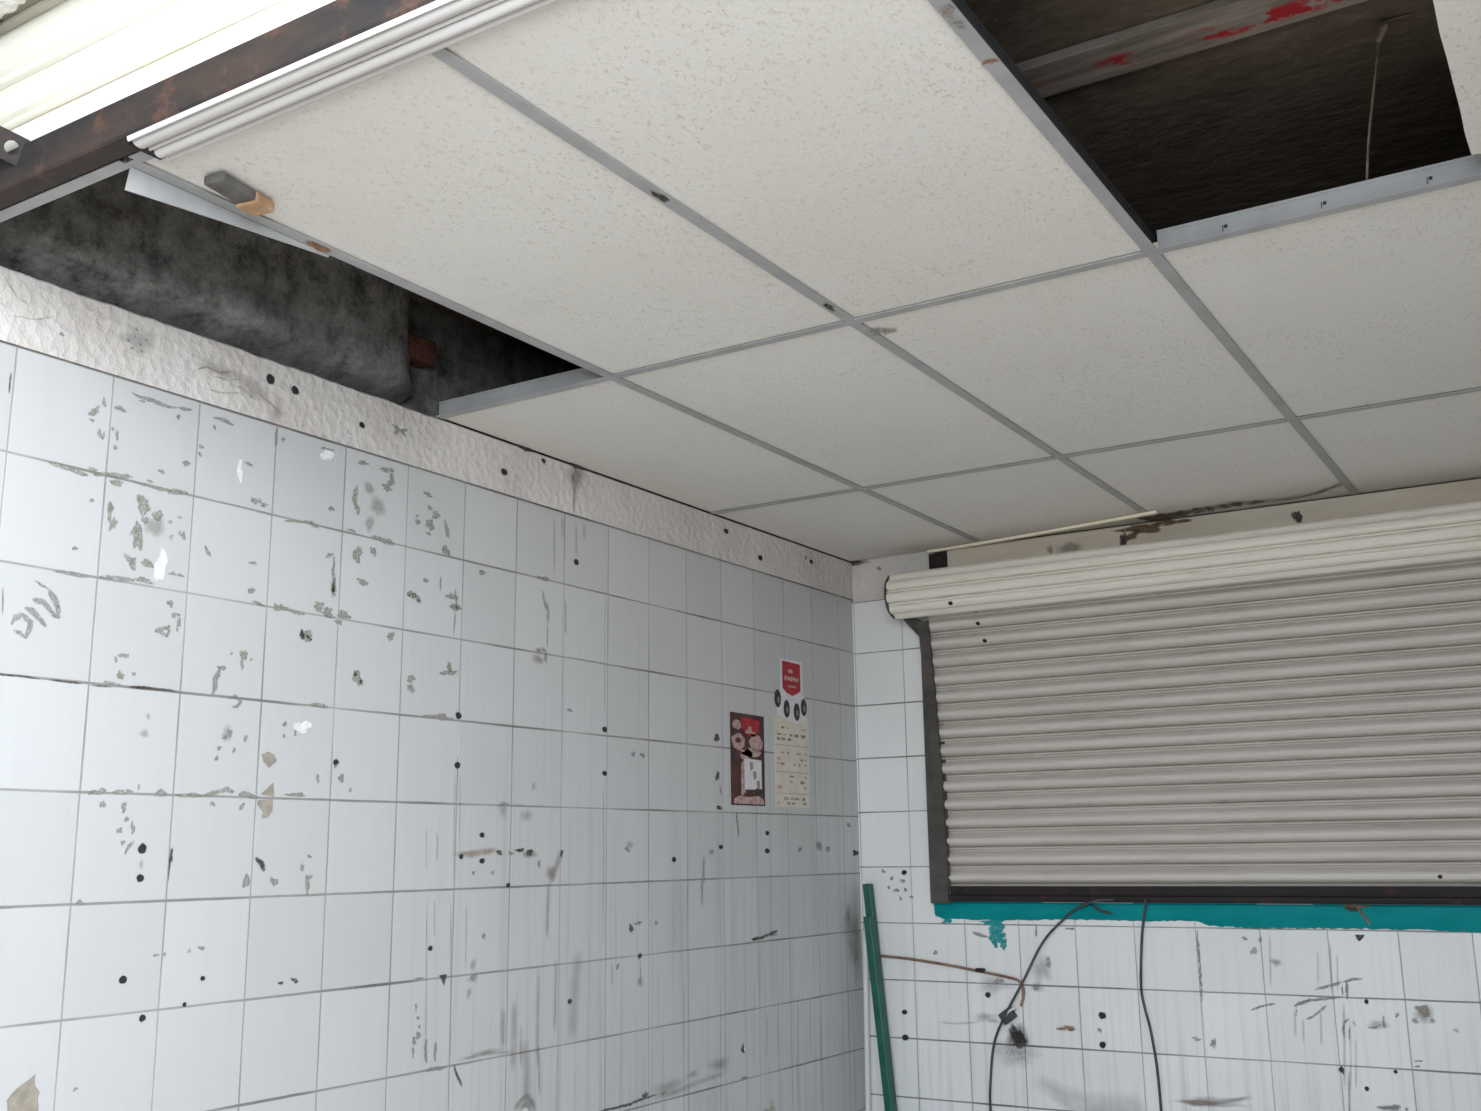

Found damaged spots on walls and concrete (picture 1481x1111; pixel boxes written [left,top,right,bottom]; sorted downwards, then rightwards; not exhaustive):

corrosion [306,242,330,253]
peeling [89,397,126,450]
peeling [352,460,395,528]
peeling [89,470,185,584]
peeling [2,581,60,638]
peeling [155,600,181,637]
peeling [314,553,351,625]
peeling [353,547,376,586]
peeling [407,578,462,632]
spalling [257,752,276,818]
spalling [242,857,278,887]
spalling [7,1075,39,1111]